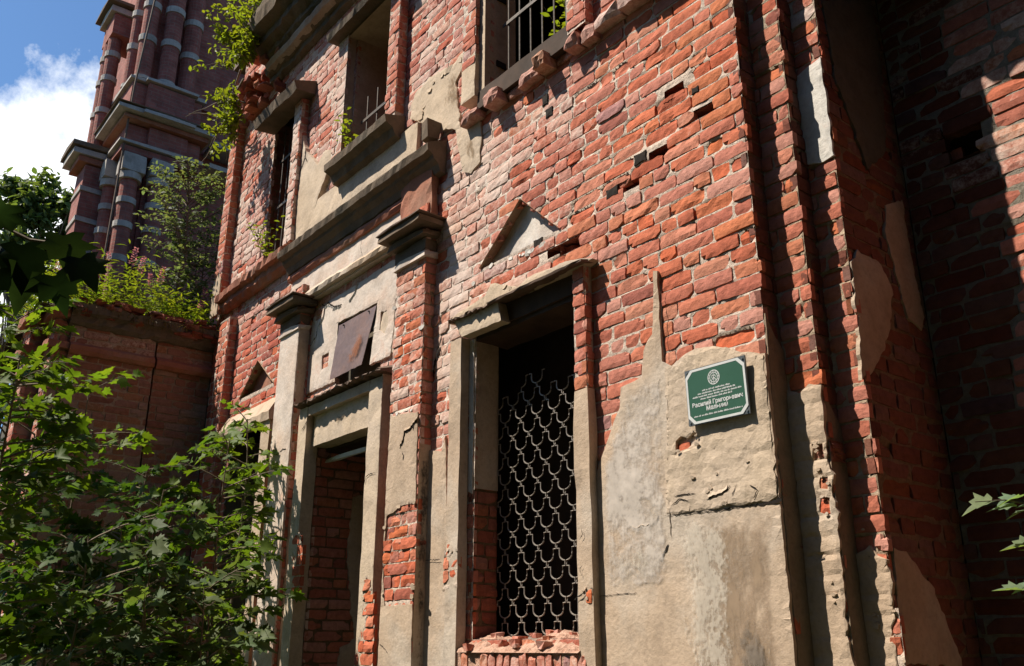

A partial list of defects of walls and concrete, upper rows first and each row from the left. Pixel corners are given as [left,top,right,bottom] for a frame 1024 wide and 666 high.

hole [664,81,699,101]
hole [687,102,715,125]
hole [634,144,670,166]
crack [399,415,418,458]
spalling [675,431,699,452]
spalling [816,468,831,515]
spalling [354,499,423,666]
spalling [890,608,907,666]